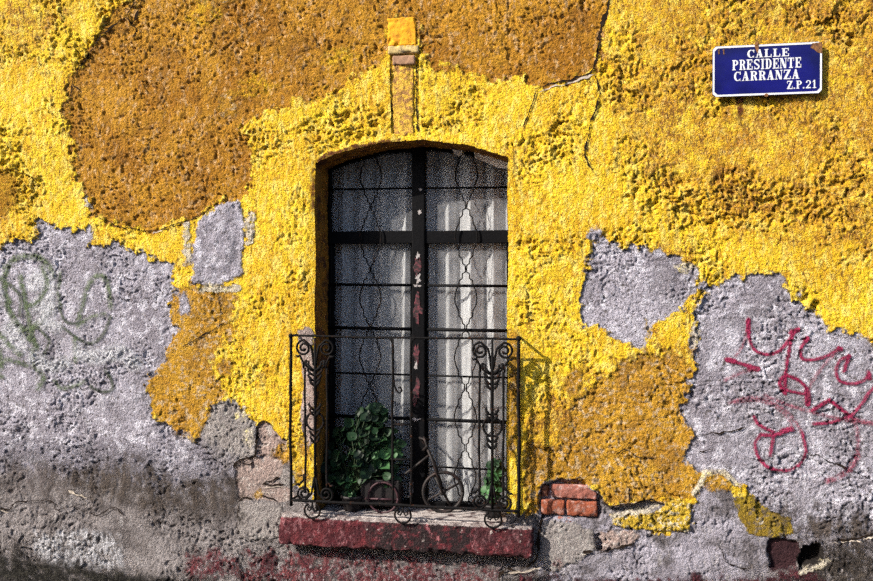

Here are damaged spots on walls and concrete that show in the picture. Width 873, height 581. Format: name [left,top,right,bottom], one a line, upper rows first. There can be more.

crack [523,0,609,172]
peeling [0,0,610,503]
spalling [507,229,873,547]
water stain [34,529,122,569]
water stain [0,456,243,523]
water stain [767,503,873,581]